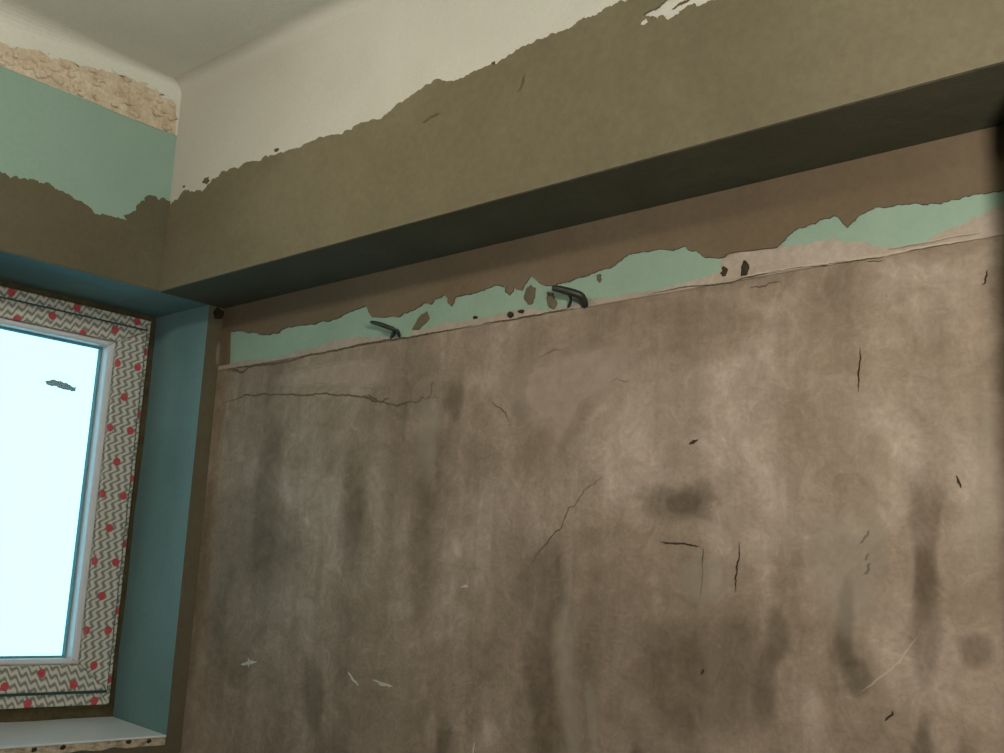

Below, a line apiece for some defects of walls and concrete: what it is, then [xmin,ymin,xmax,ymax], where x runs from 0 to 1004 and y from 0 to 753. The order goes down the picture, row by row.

spalling [0,42,178,135]
peeling [781,190,1004,248]
peeling [230,247,721,364]
crack [648,257,883,295]
crack [224,308,571,407]
crack [532,477,602,564]